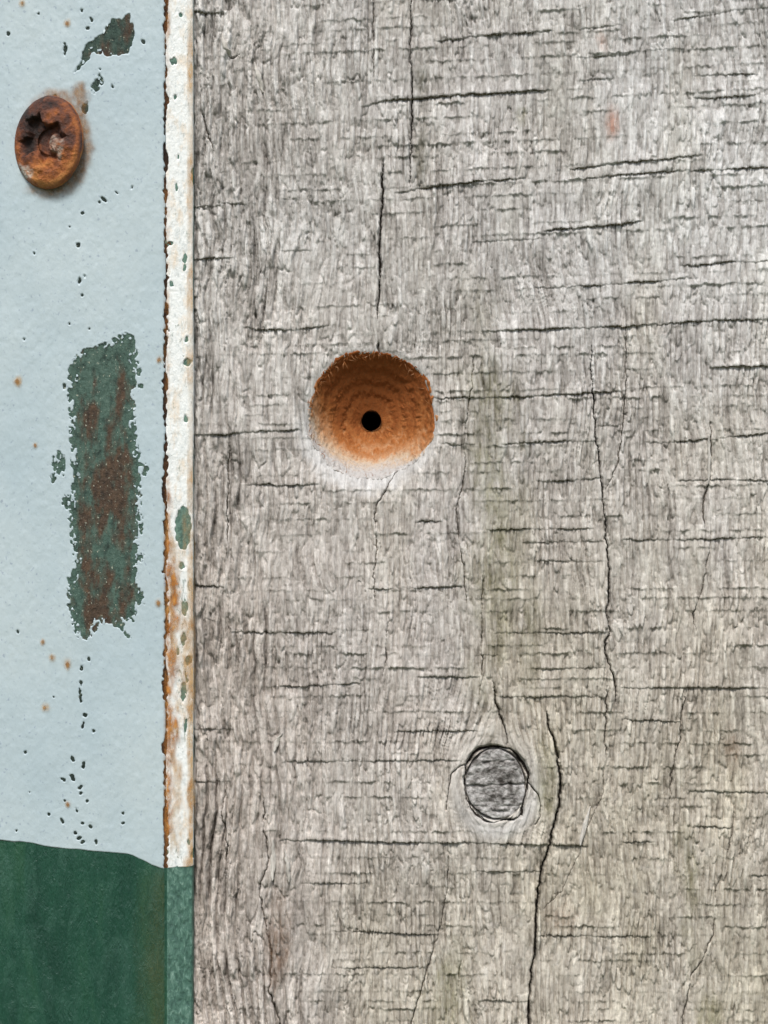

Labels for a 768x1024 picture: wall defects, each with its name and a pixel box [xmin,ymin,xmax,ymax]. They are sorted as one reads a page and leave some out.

corrosion [48,84,89,194]
peeling [81,69,114,114]
peeling [75,9,145,72]
crack [377,160,385,319]
peeling [50,333,149,640]
corrosion [157,0,196,868]
crack [446,327,628,1024]
crack [411,855,449,1023]